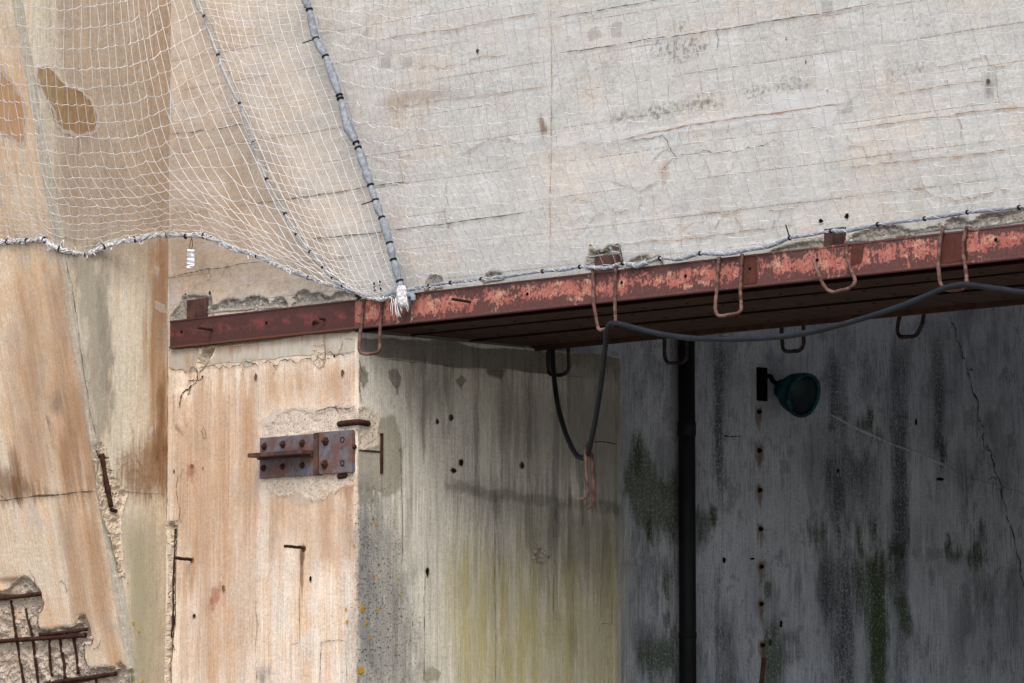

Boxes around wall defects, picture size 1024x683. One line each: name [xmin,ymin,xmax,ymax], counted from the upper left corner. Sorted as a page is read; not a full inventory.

crack [250,0,888,245]
rust [743,256,757,285]
rust [851,244,864,265]
rust [940,233,967,264]
spalling [93,440,129,577]
crack [0,254,366,522]
spalling [196,346,215,378]
spalling [267,474,355,501]
spalling [264,404,380,450]
crack [950,315,1024,585]
spalling [0,576,132,683]
leakage [871,543,904,683]